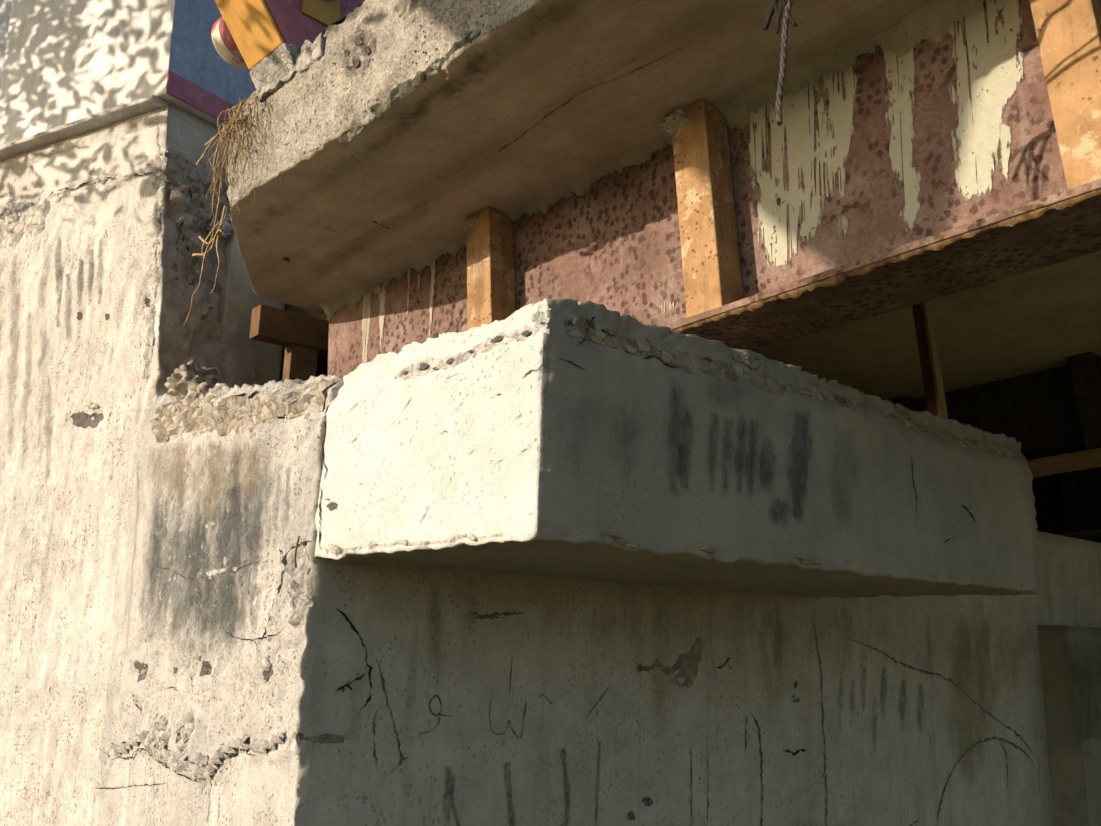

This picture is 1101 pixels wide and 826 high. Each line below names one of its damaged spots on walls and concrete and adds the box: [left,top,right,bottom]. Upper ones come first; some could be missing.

spalling [338,29,481,144]
damp [55,238,101,338]
flaking render [0,125,231,384]
spalling [521,304,551,336]
spalling [70,401,104,429]
spalling [151,378,339,444]
damp [149,449,288,634]
crack [154,389,381,659]
flaking render [104,708,347,792]
crack [336,608,408,774]
crack [745,615,828,826]
crack [848,638,1040,826]